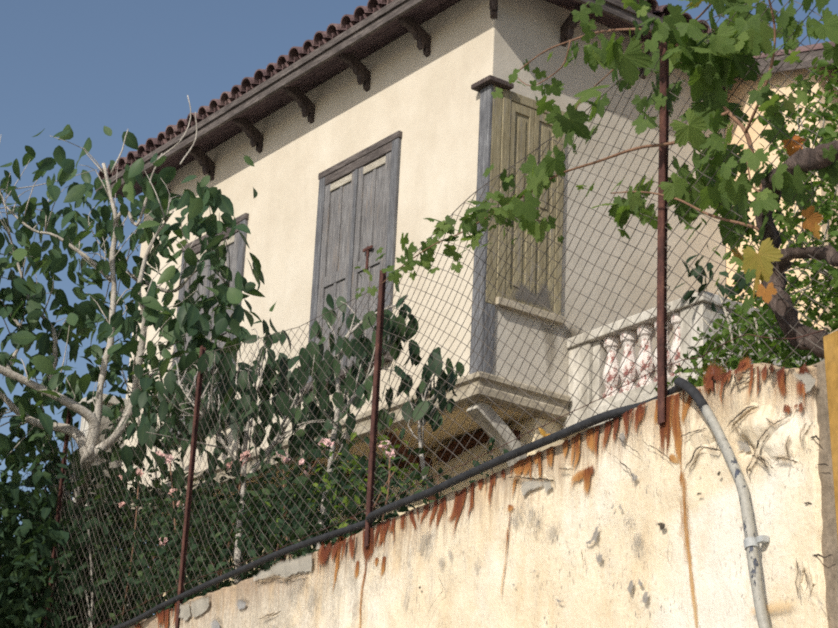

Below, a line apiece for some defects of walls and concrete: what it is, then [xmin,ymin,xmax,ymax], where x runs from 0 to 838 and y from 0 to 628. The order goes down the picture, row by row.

crack [609,367,828,486]
rust [699,358,809,414]
rust [317,403,645,628]
rust [654,390,698,628]
rust [156,602,177,628]